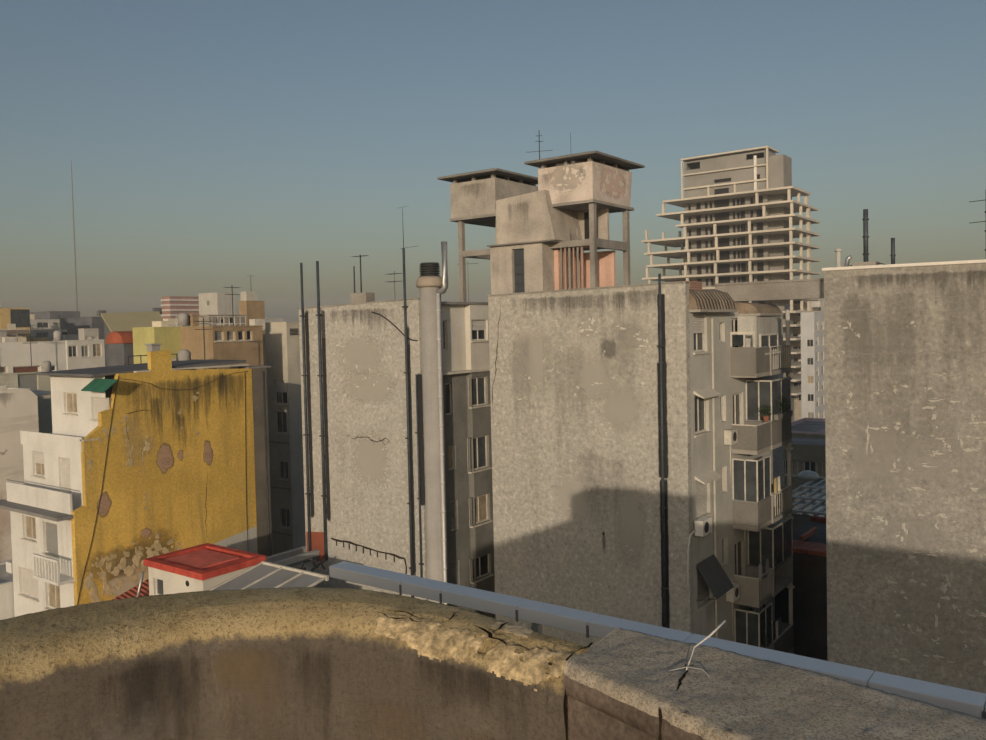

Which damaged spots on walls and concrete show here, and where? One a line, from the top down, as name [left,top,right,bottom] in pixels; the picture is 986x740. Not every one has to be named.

flaking render [99,408,183,474]
flaking render [195,429,214,466]
flaking render [97,491,112,518]
peeling [85,528,182,603]
crack [376,609,531,650]